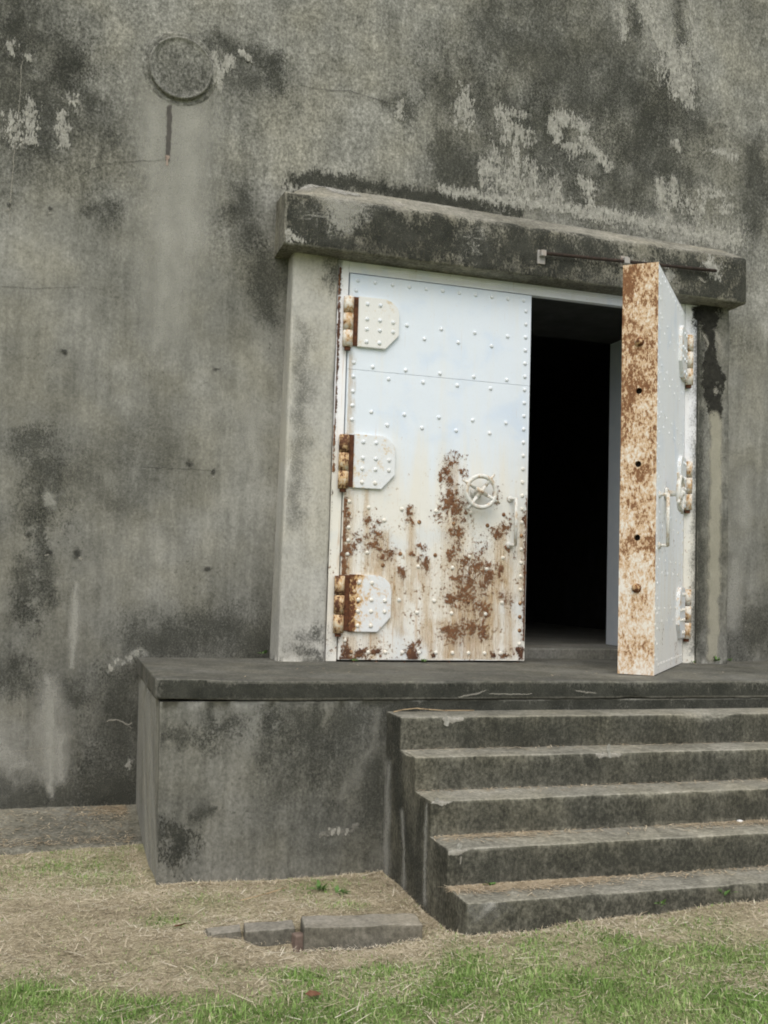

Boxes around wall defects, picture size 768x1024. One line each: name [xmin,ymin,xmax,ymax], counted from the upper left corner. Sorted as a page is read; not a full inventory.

damp [0,0,127,172]
damp [281,0,746,302]
damp [8,426,71,623]
damp [690,309,767,661]
damp [0,584,768,903]